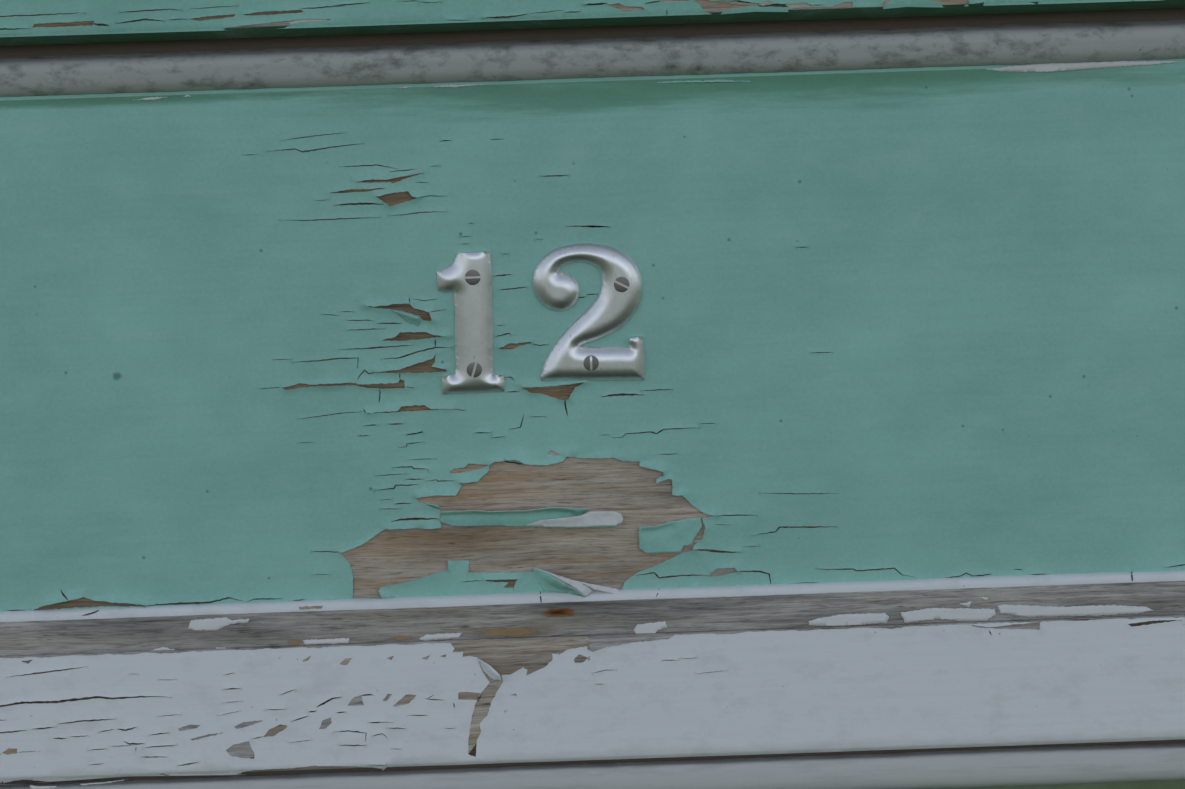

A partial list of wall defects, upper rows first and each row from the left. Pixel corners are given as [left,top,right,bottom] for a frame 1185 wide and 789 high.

peeling [169,10,330,28]
peeling [585,0,864,13]
peeling [986,61,1184,72]
crack [249,133,451,183]
crack [294,200,472,244]
crack [274,311,452,379]
crack [477,377,546,438]
crack [601,389,669,397]
peeling [341,450,771,598]
peeling [809,596,1176,635]
peeling [420,621,679,757]
peeling [178,720,369,772]